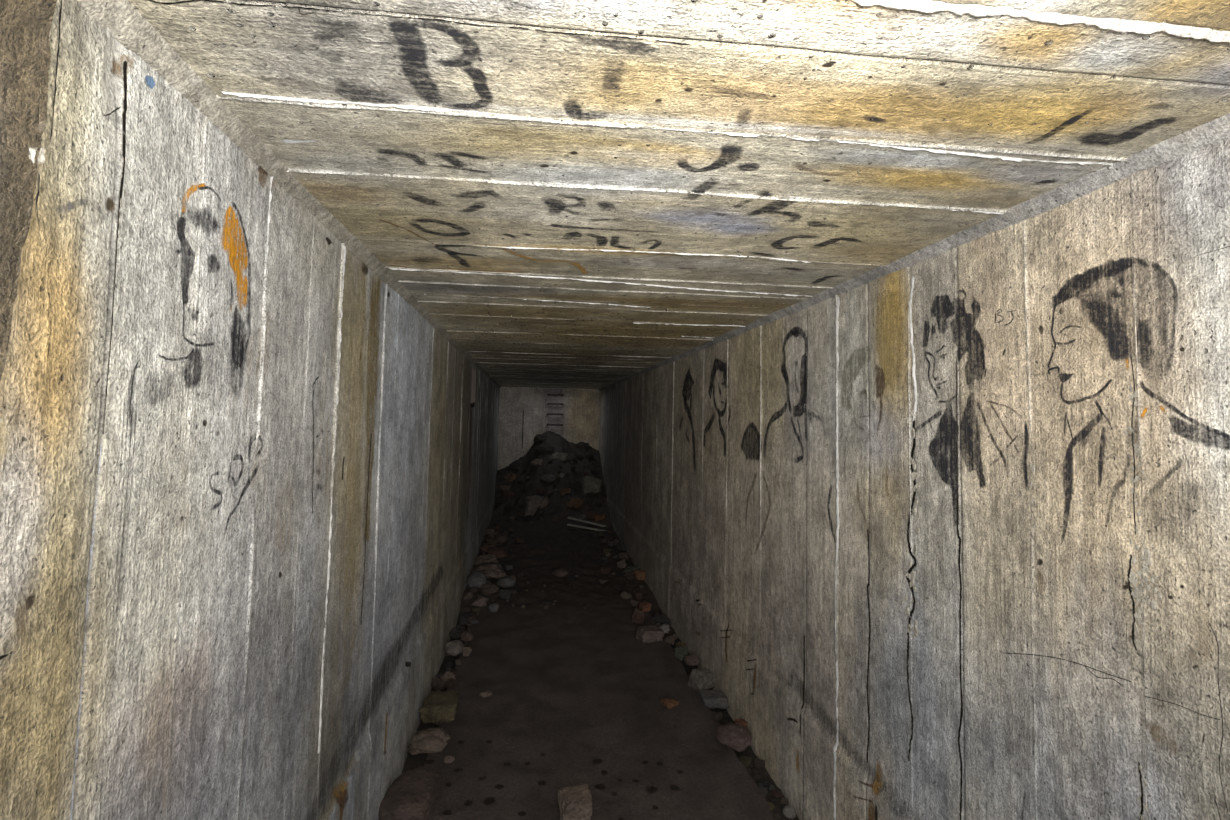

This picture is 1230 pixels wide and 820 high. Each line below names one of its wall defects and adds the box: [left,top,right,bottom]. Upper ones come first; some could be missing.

corrosion [333,782,348,820]
crack [864,529,872,763]
crack [901,383,922,761]
crack [955,358,963,820]
crack [1007,624,1228,820]
crack [1123,356,1137,651]